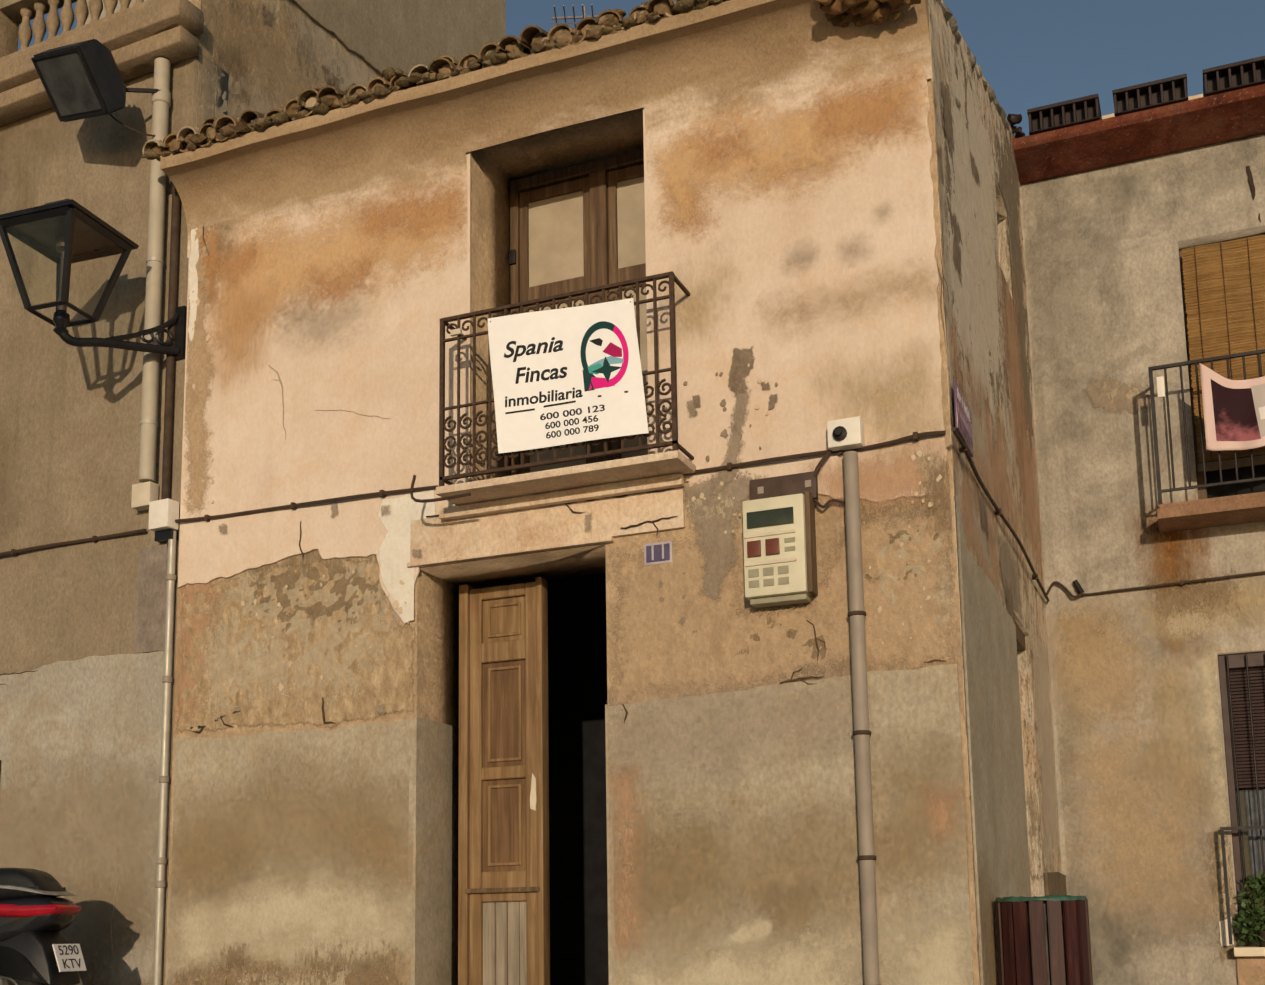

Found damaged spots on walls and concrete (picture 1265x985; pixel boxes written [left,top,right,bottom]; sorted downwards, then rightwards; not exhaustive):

water stain [656,79,922,227]
water stain [214,190,467,369]
crack [269,365,286,439]
flaking render [608,23,1041,705]
crack [550,488,677,536]
flaking render [174,555,415,733]
crack [780,620,825,685]
water stain [177,866,412,971]